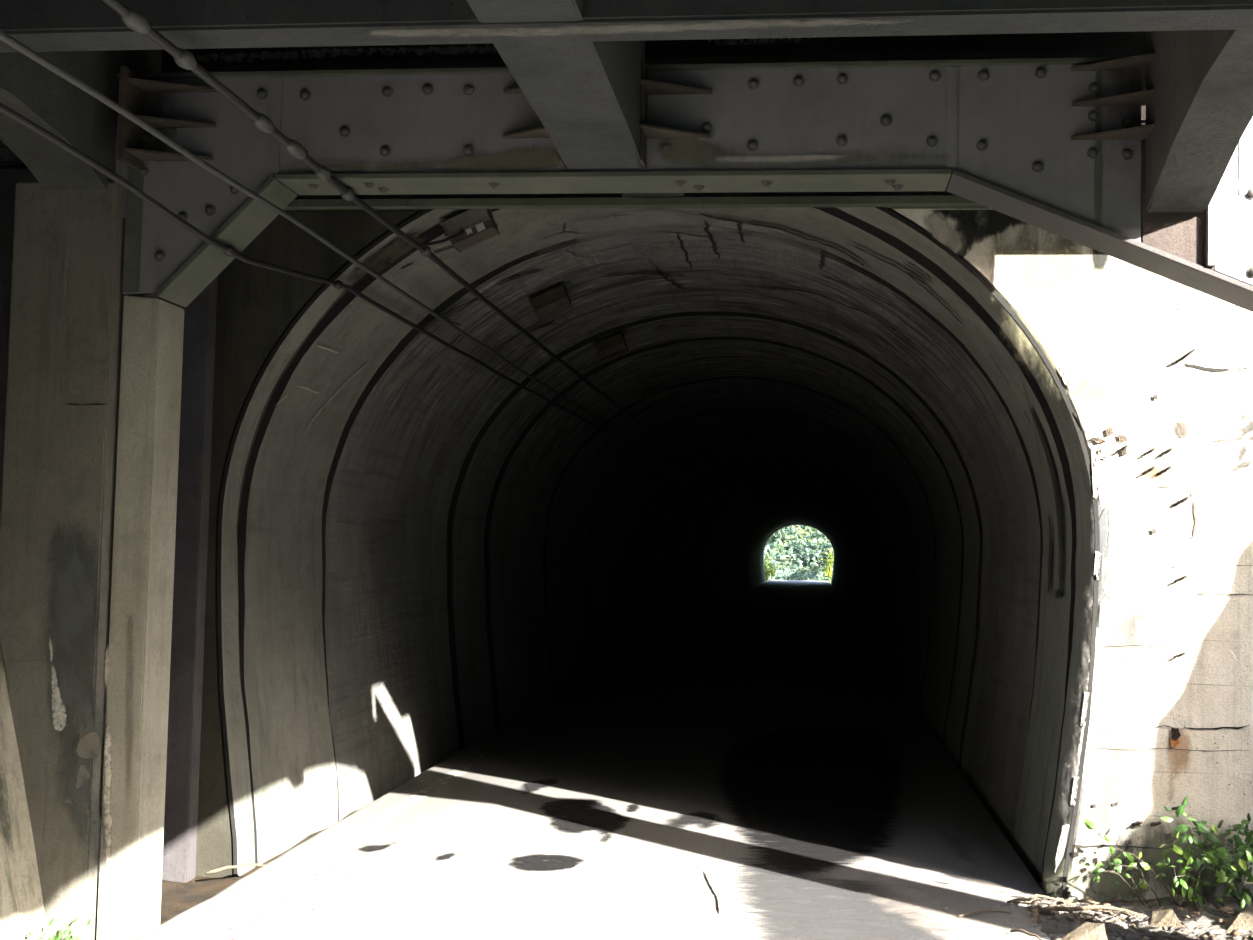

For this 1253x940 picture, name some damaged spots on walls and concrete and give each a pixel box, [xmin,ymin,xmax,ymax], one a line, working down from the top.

water stain [925,210,1026,258]
water stain [1092,249,1109,269]
crack [422,213,1043,472]
water stain [1145,280,1194,509]
spalling [1075,414,1128,499]
water stain [49,529,113,886]
spalling [1080,692,1089,726]
water stain [1059,501,1238,902]
water stain [0,773,12,847]
spalling [1070,777,1079,806]
spalling [1055,825,1070,872]